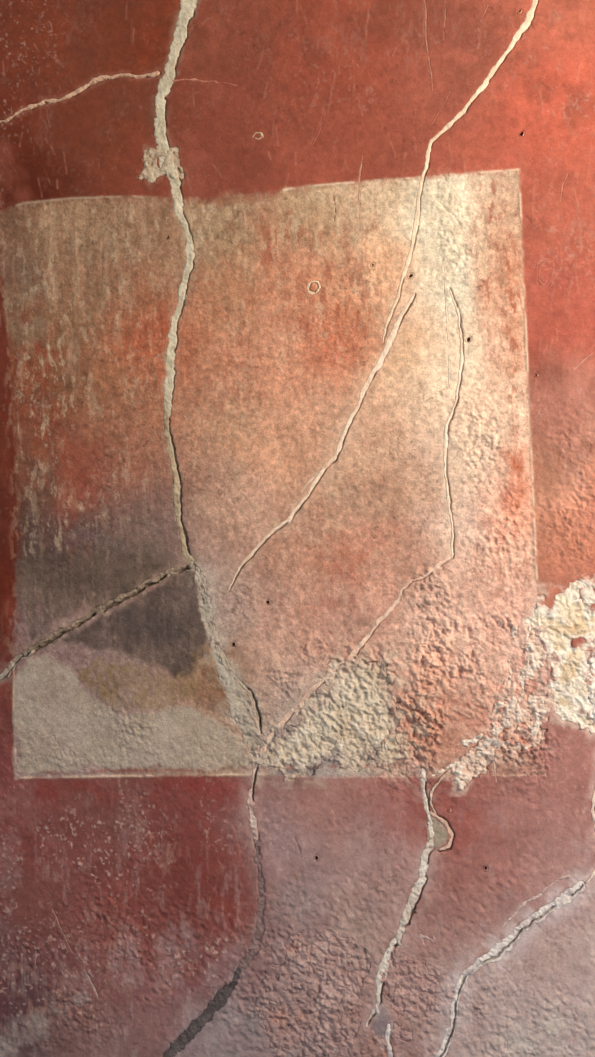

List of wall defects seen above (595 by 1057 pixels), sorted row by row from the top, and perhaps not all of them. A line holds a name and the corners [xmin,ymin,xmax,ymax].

crack [228,0,538,592]
crack [0,0,467,1057]
spalling [429,573,595,791]
crack [587,787,595,830]
crack [435,870,595,1057]